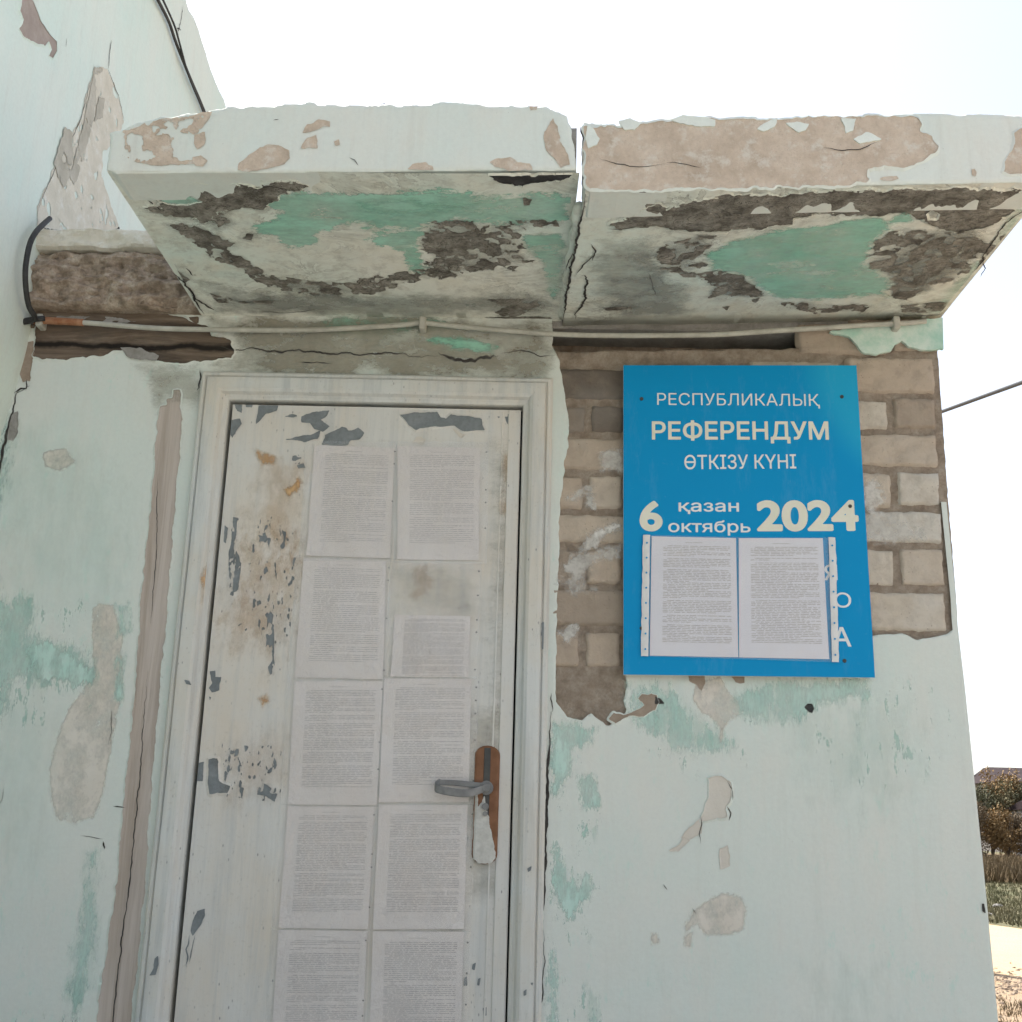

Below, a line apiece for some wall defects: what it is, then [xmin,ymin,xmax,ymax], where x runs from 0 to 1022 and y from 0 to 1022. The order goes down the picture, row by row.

peeling [18,0,57,60]
peeling [54,67,105,187]
peeling [123,112,212,166]
crack [563,194,597,319]
peeling [142,113,1022,315]
crack [0,380,27,470]
peeling [230,405,364,446]
peeling [224,516,296,675]
peeling [50,605,122,821]
peeling [209,671,221,699]
peeling [197,744,282,802]
peeling [669,773,734,852]